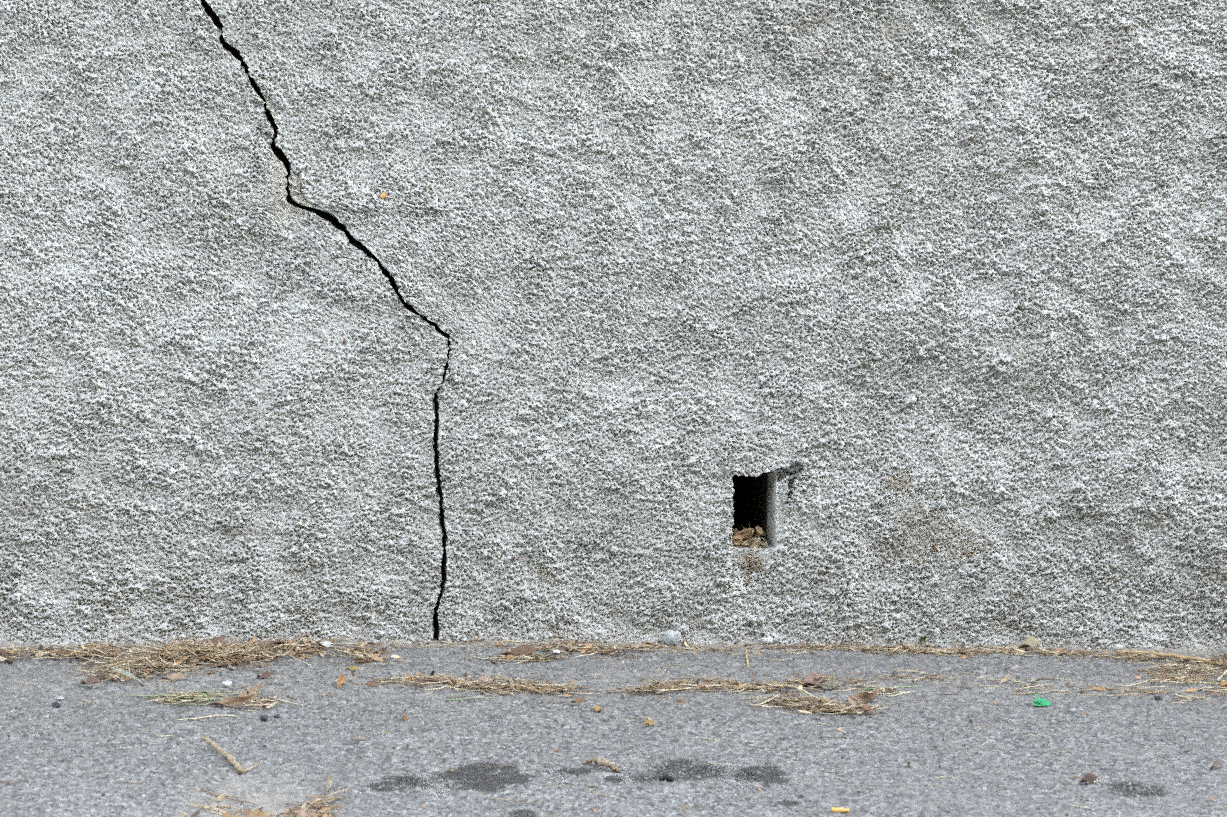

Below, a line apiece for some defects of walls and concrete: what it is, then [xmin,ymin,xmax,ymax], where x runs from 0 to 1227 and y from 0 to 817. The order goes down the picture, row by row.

crack [200,0,459,640]